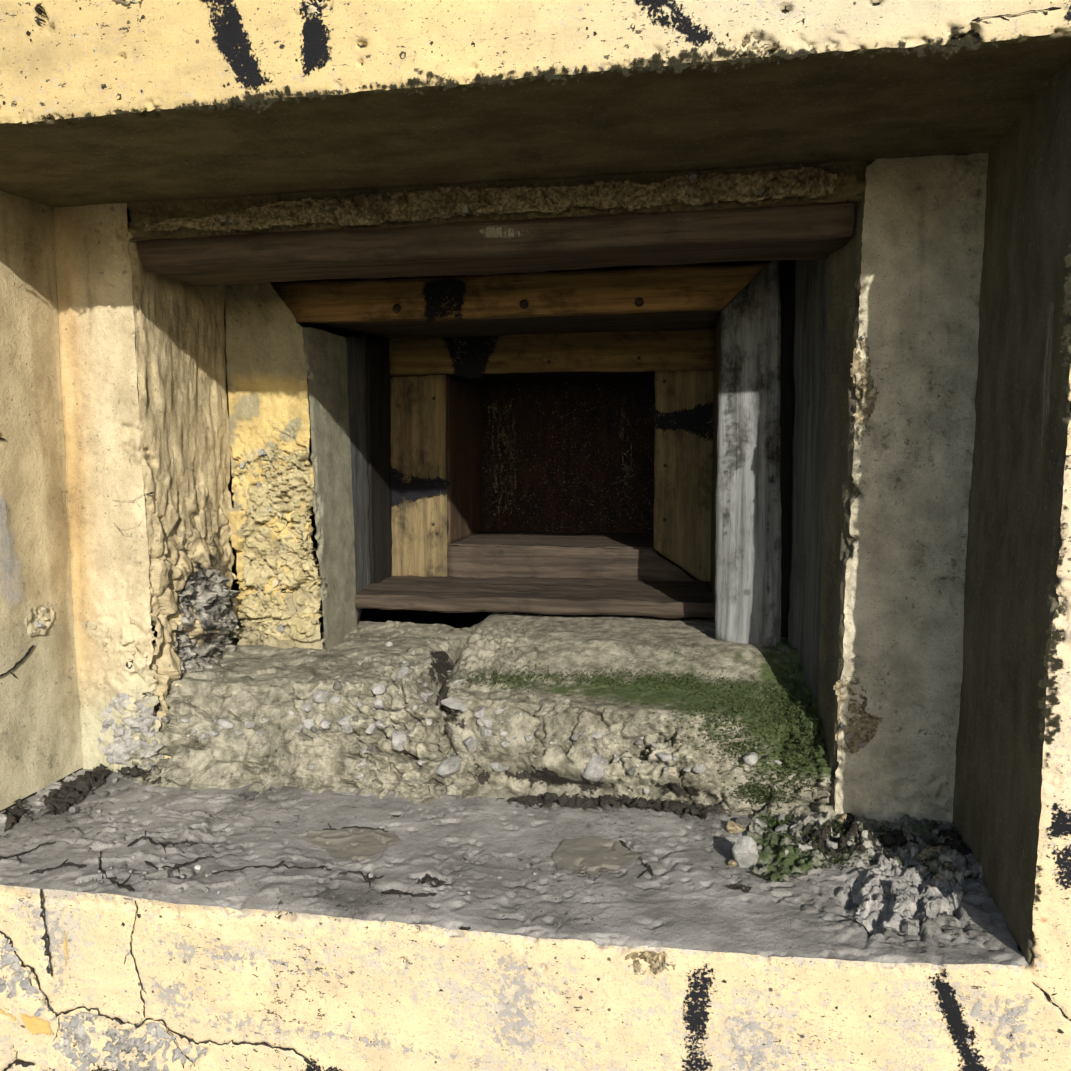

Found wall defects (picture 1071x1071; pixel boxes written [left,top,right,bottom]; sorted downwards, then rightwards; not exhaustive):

spalling [82,620,141,655]
peeling [173,446,327,680]
spalling [97,686,163,770]
crack [0,831,437,1071]
spalling [0,901,456,1071]